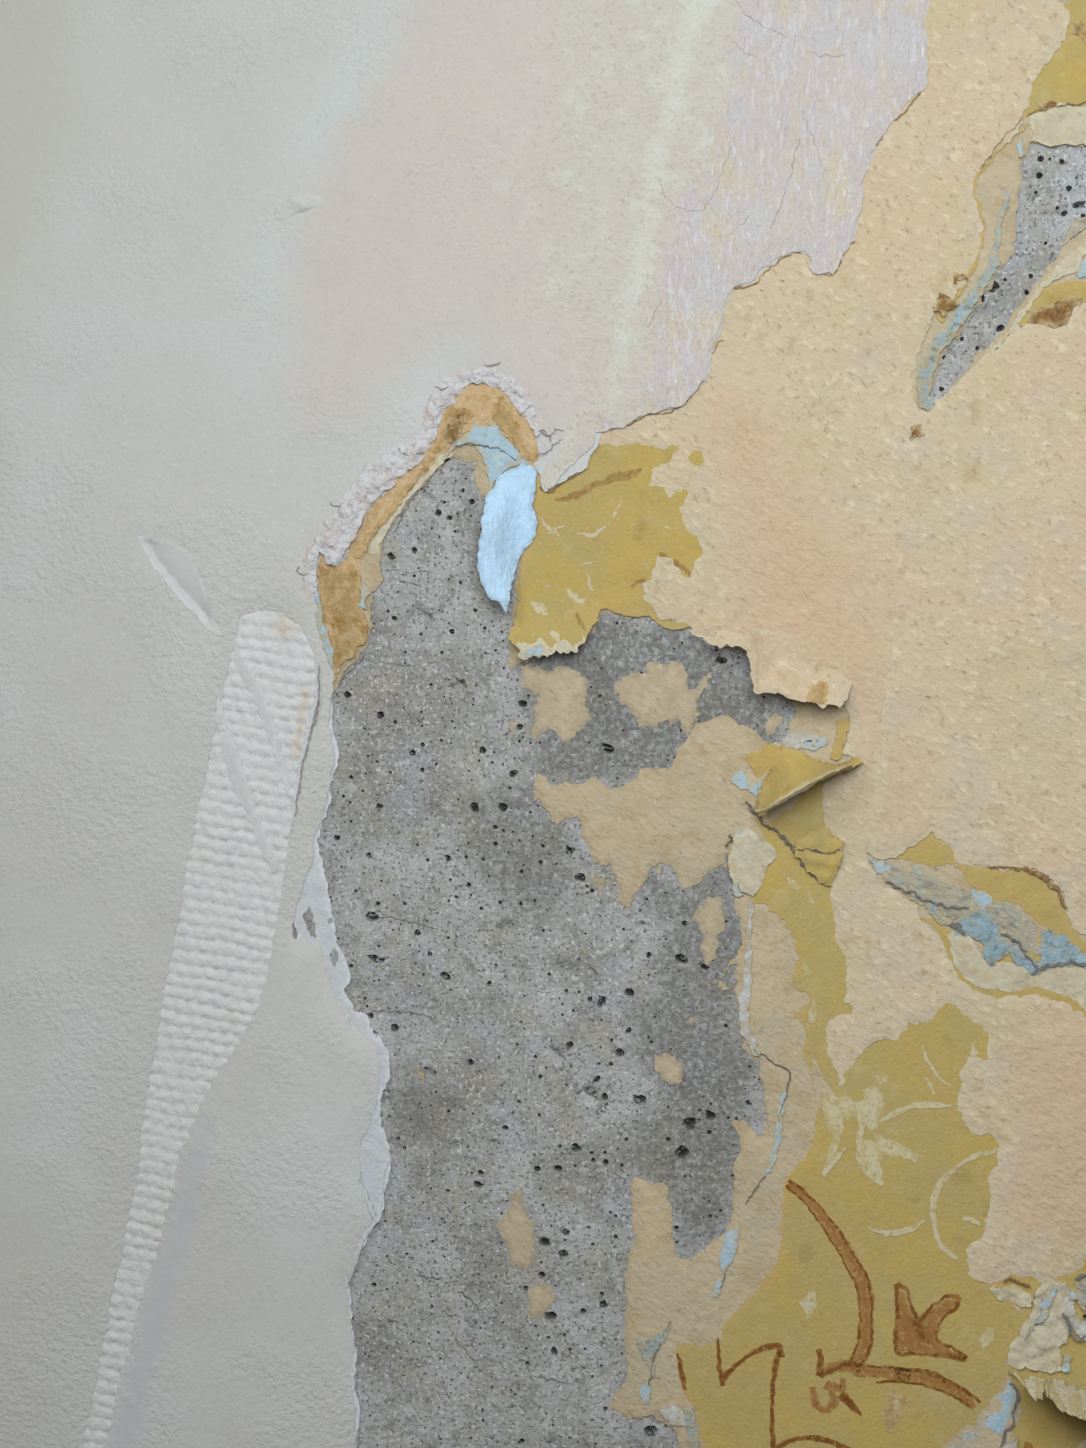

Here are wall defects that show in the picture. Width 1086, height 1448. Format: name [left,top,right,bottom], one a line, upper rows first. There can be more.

peeling [916,101,1086,411]
peeling [290,0,930,1448]
peeling [869,833,1086,1011]
spalling [942,1274,1086,1448]